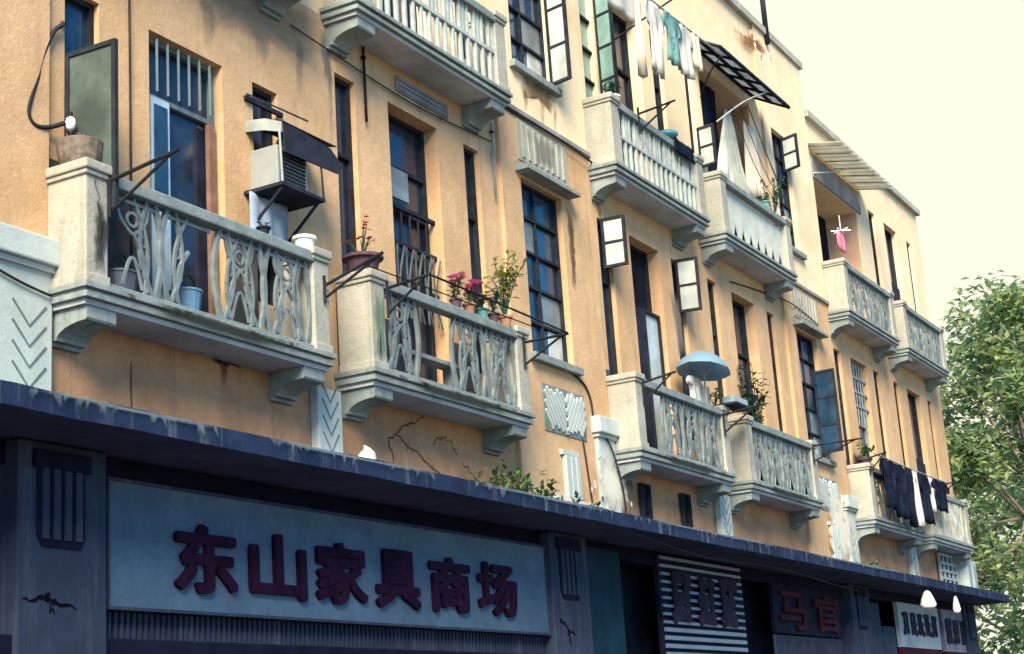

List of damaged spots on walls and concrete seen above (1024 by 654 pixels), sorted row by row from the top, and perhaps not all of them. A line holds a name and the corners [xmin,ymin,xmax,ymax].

damp [59,394,217,430]
damp [290,442,416,470]
crack [388,417,477,481]
crack [22,592,76,615]
crack [560,618,576,646]